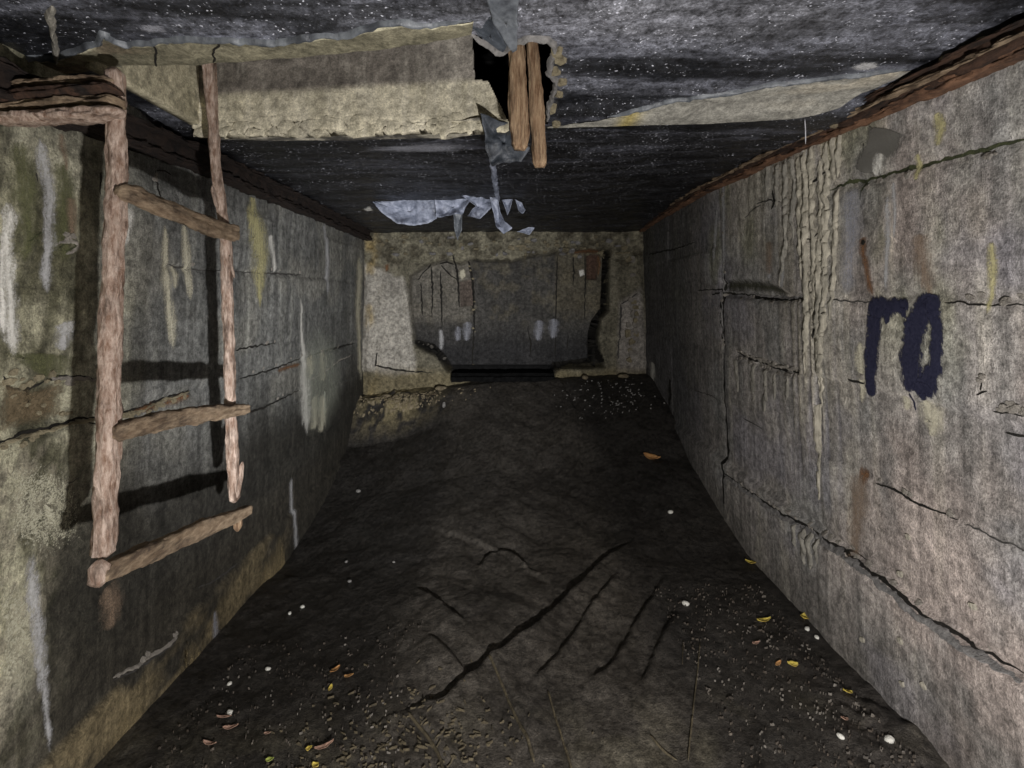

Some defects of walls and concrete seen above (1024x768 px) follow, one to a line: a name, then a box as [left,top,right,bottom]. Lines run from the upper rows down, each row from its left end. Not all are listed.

peeling [25,19,910,128]
crack [808,139,1024,199]
damp [0,143,74,350]
corrosion [859,238,873,294]
damp [764,135,855,500]
crack [0,416,96,450]
crack [2,368,95,402]
crack [122,390,189,418]
crack [668,189,1024,684]